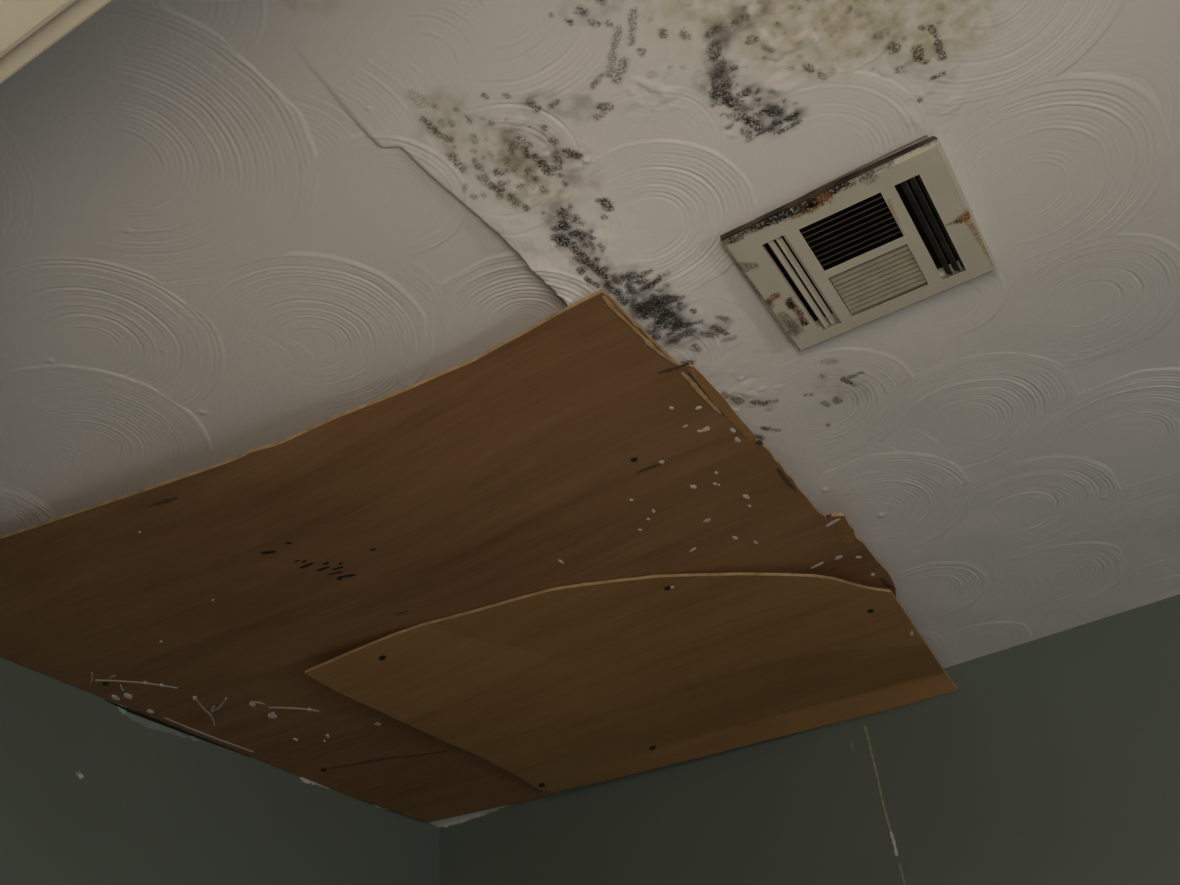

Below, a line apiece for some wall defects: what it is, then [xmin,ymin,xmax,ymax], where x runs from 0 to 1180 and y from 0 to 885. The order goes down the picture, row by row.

leakage [913,25,946,79]
leakage [712,68,799,137]
leakage [524,126,582,186]
leakage [551,208,729,364]
corrosion [766,293,809,332]
crack [864,725,906,885]